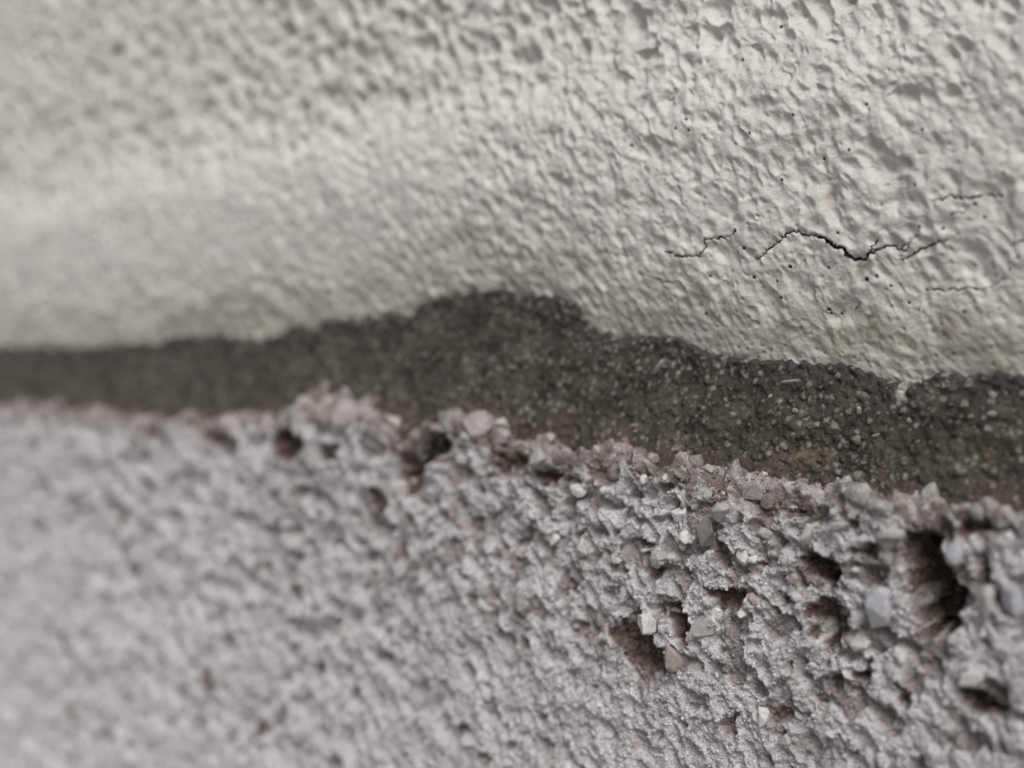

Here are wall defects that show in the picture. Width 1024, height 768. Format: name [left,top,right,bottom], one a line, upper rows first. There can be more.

crack [756,230,947,261]
flaking render [495,417,510,429]
spalling [193,424,239,454]
spalling [269,418,342,467]
spalling [364,427,454,520]
spalling [494,433,633,498]
spalling [402,512,419,532]